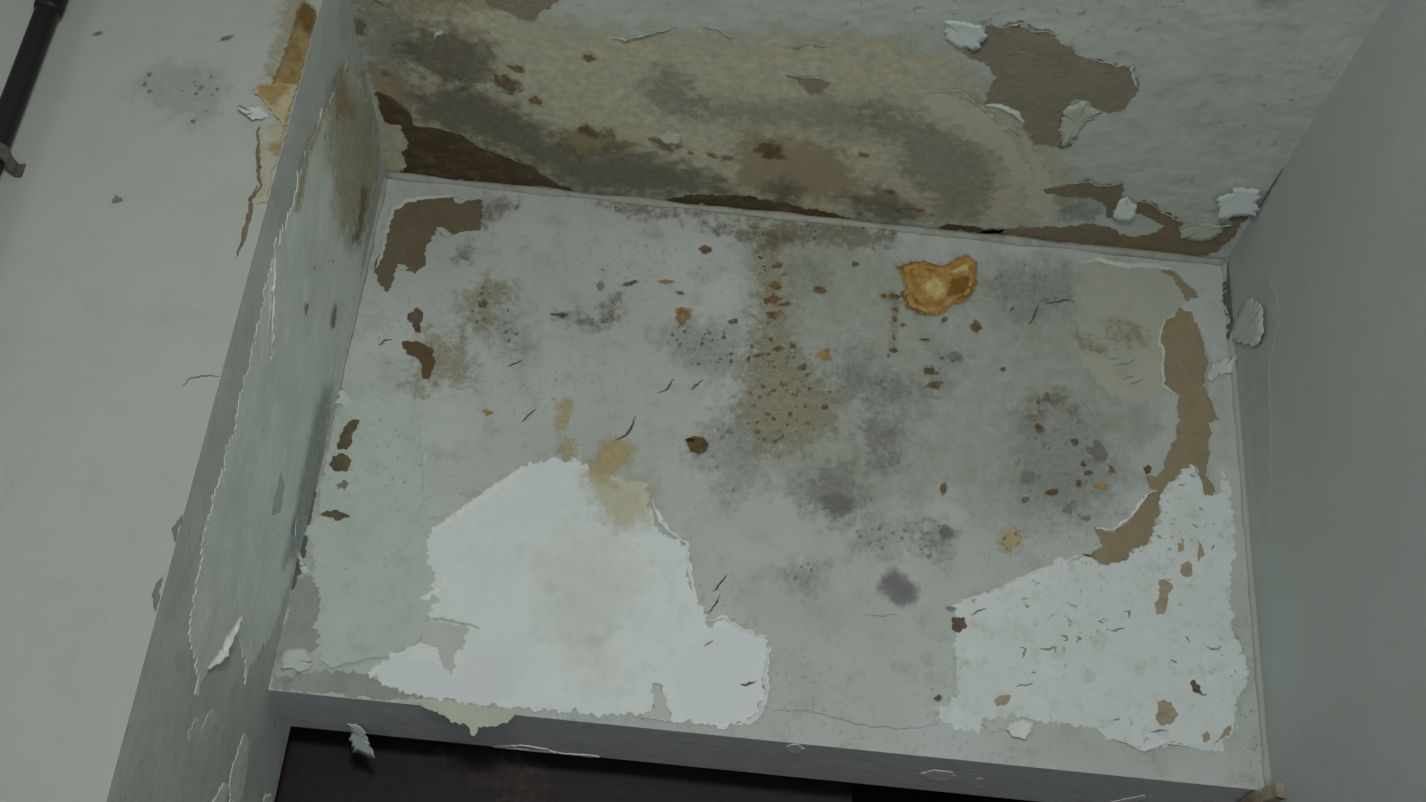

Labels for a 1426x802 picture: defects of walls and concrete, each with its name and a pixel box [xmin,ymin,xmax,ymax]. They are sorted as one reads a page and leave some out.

peeling [485,0,559,22]
spalling [236,3,316,257]
peeling [943,20,1140,148]
leakage [330,0,1074,457]
peeling [188,63,772,740]
leakage [1016,392,1115,521]
peeling [934,179,1264,753]
leakage [856,525,952,558]
peeling [212,733,250,802]